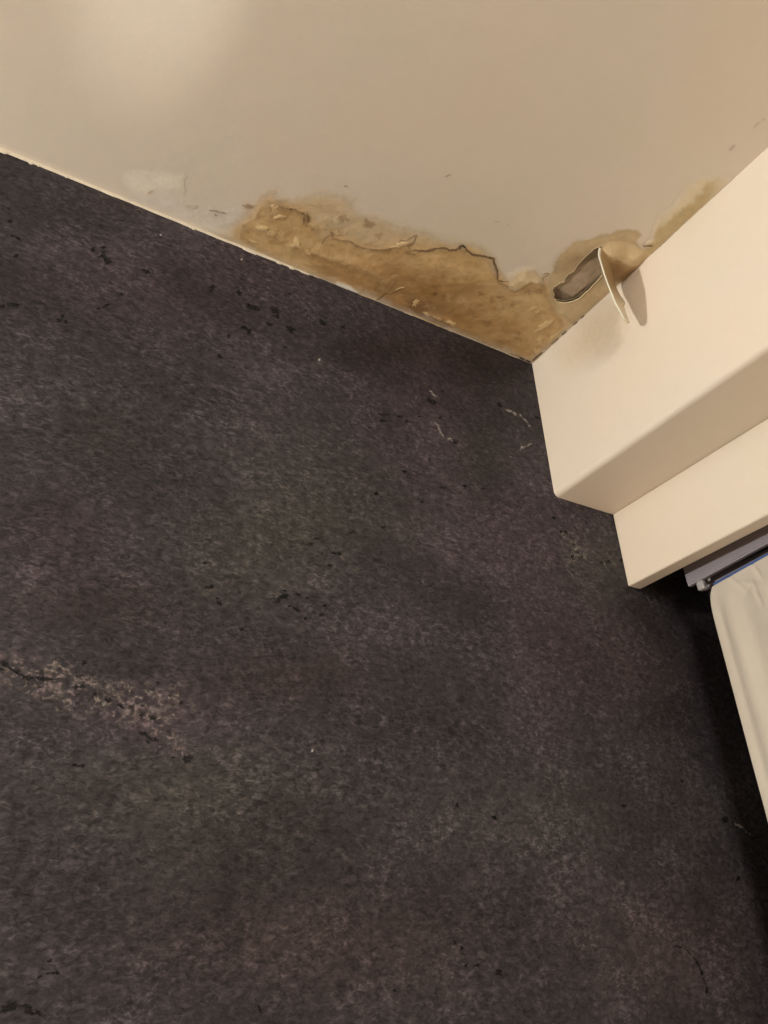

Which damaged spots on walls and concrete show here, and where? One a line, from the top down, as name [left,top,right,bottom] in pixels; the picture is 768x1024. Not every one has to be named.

peeling [334,280,380,302]
leakage [126,174,734,381]
peeling [552,245,630,324]